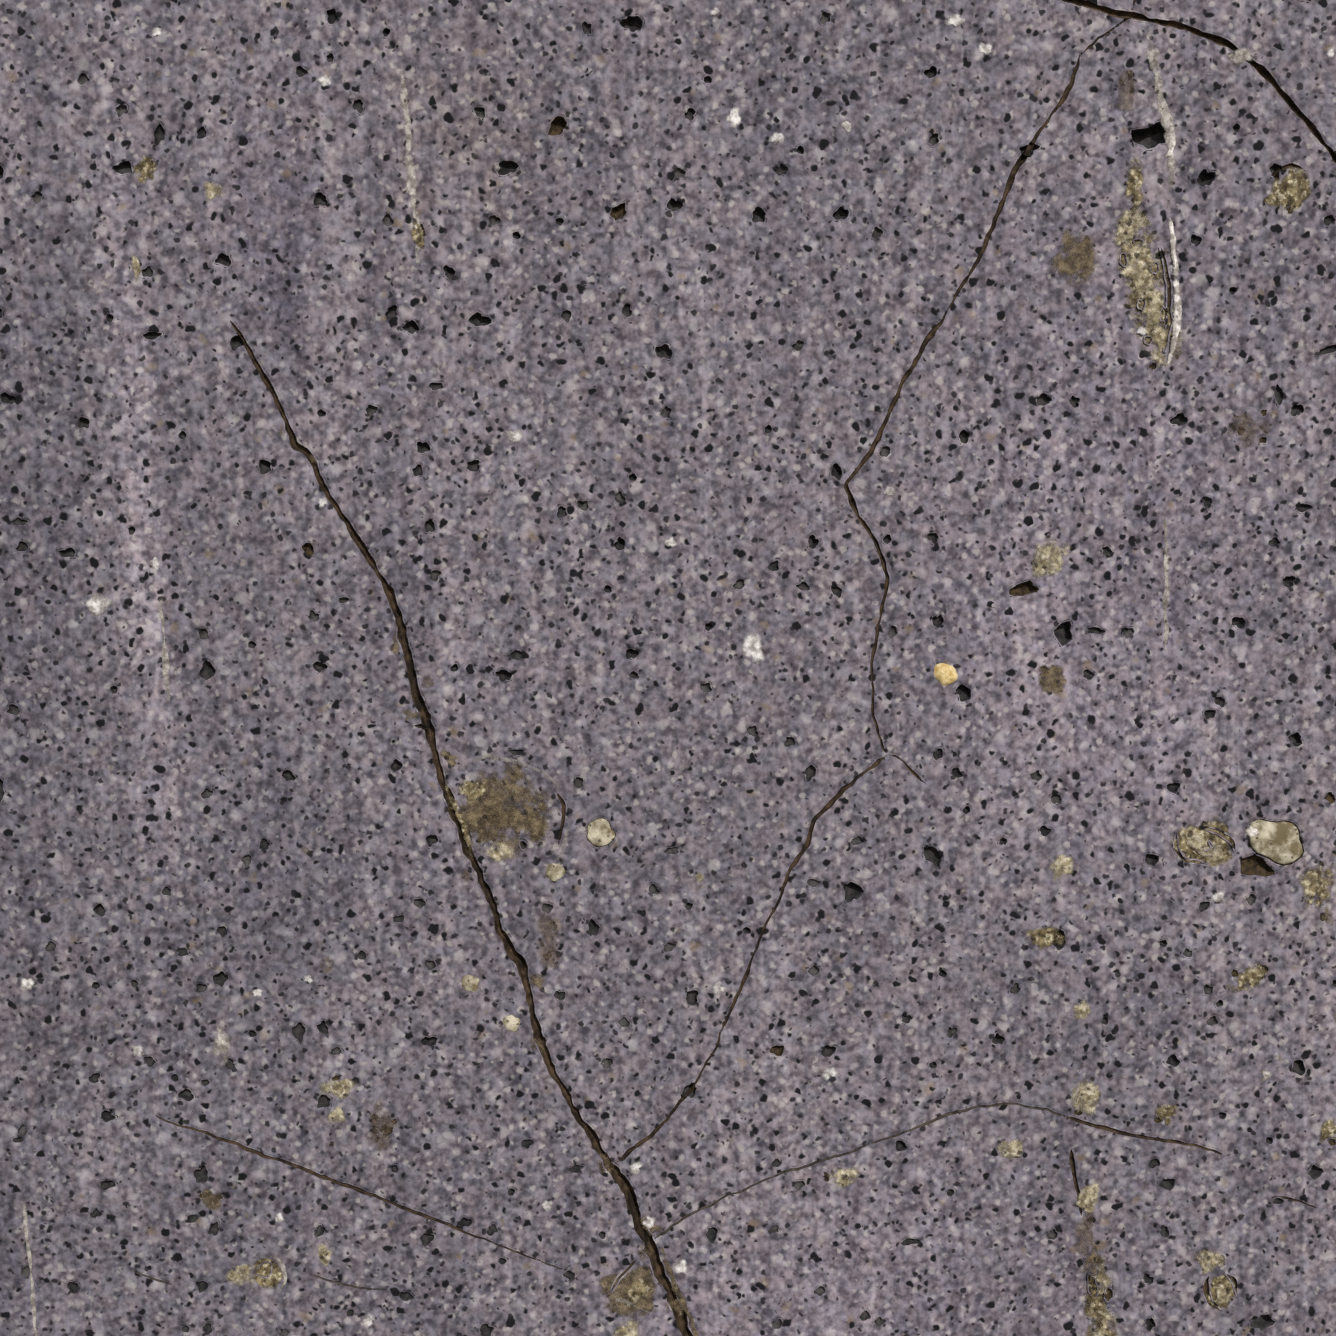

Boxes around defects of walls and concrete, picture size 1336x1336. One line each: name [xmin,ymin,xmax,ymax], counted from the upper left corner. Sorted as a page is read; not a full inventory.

crack [1244,56,1336,165]
crack [1267,162,1307,183]
crack [227,0,1240,1336]
crack [152,1112,580,1277]
crack [1269,1195,1320,1211]
crack [126,1267,179,1287]